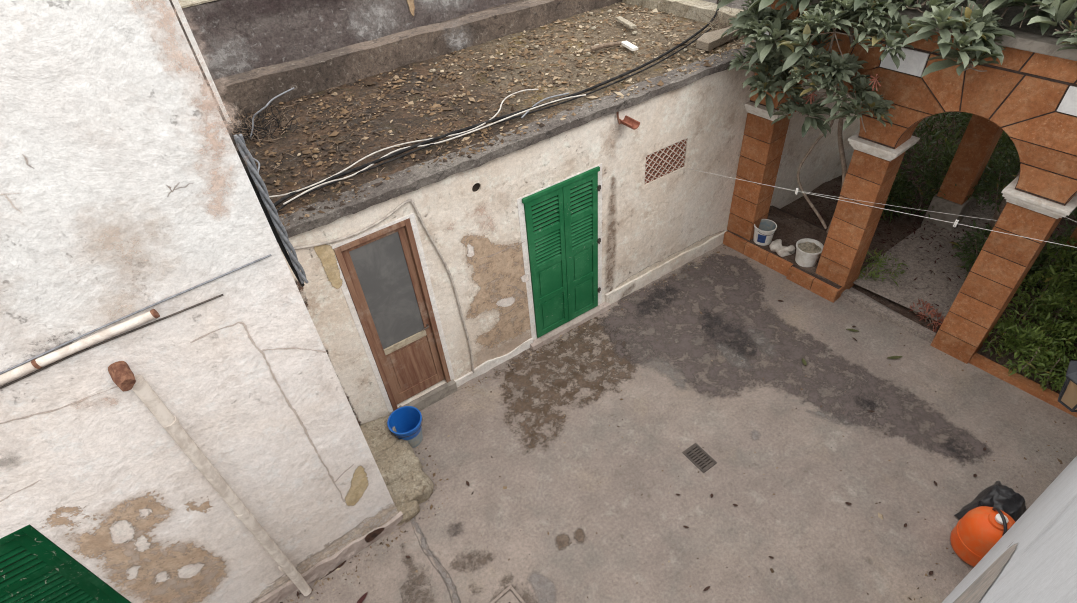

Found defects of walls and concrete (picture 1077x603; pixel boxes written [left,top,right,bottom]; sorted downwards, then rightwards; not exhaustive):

crack [295,281,308,308]
flaking render [314,244,343,289]
flaking render [461,234,531,348]
water stain [477,178,990,463]
crack [190,322,361,502]
flaking render [345,466,369,506]
flaking render [42,490,227,603]
crack [312,517,368,557]
crack [412,517,460,602]